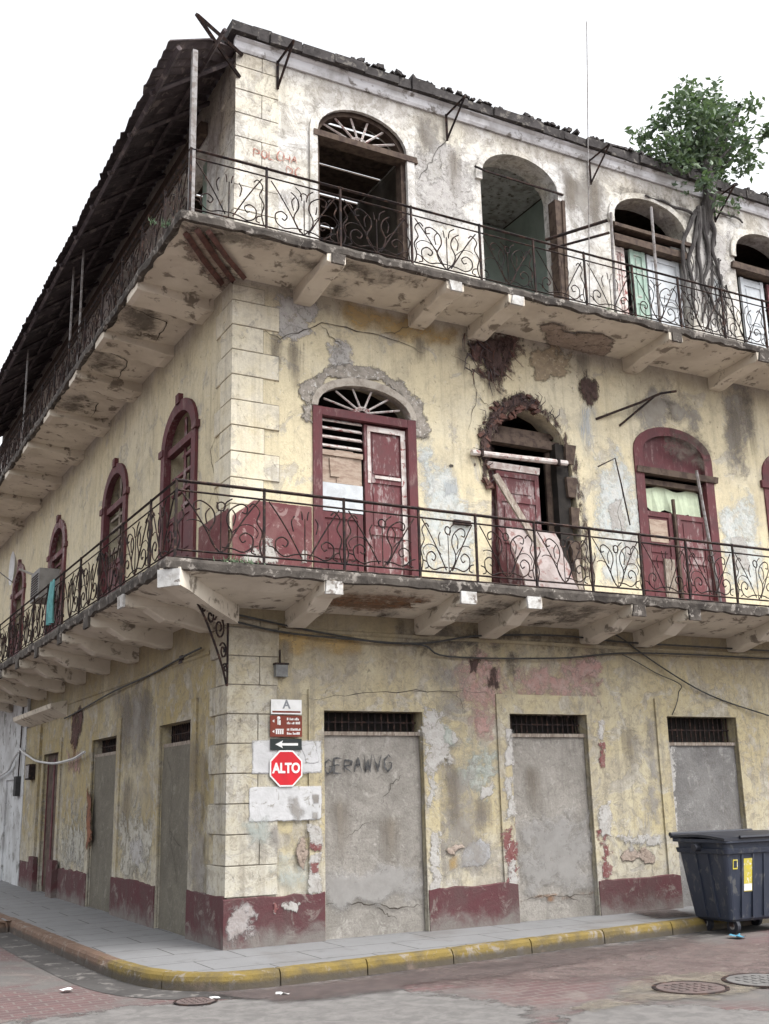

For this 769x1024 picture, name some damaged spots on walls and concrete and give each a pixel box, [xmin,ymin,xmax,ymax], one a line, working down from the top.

damp [118,307,167,341]
crack [261,322,425,354]
spalling [460,322,615,490]
peeling [298,339,475,575]
peeling [240,538,279,564]
crack [308,689,480,718]
peeling [594,720,606,768]
peeling [418,653,602,890]
peeling [596,800,662,878]
crack [326,902,422,919]